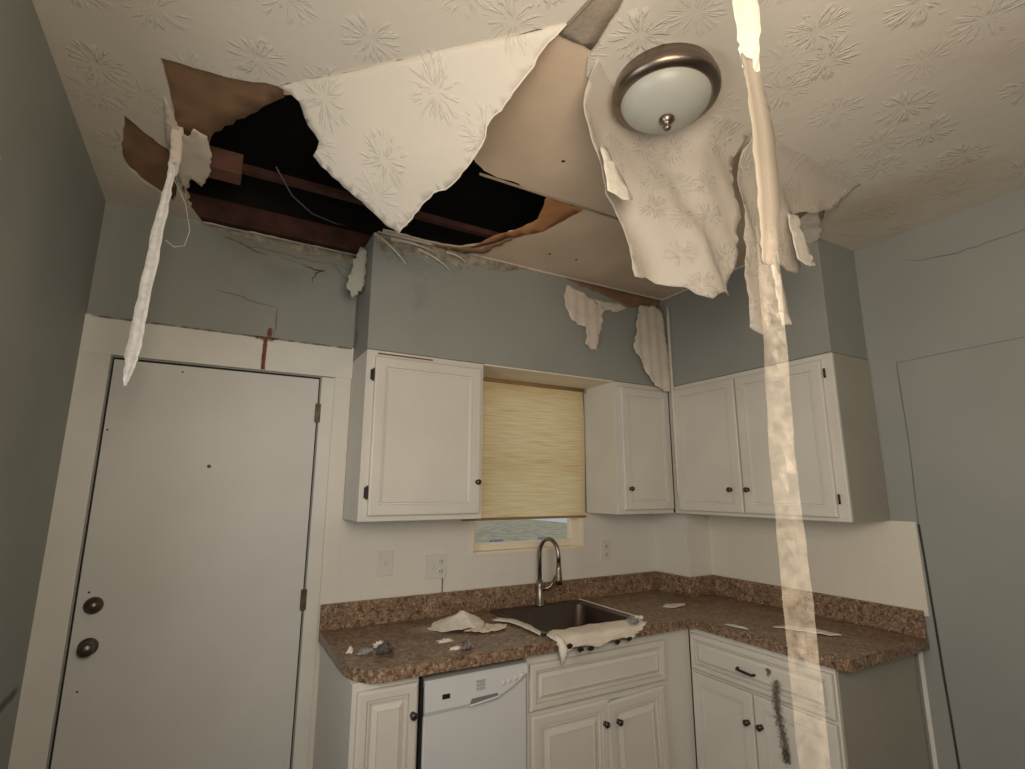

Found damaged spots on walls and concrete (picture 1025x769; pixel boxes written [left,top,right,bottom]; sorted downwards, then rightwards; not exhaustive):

peeling [374,232,466,270]
peeling [800,212,822,245]
crack [901,229,1025,261]
peeling [346,247,368,298]
corrosion [256,328,279,370]
peeling [564,284,671,393]